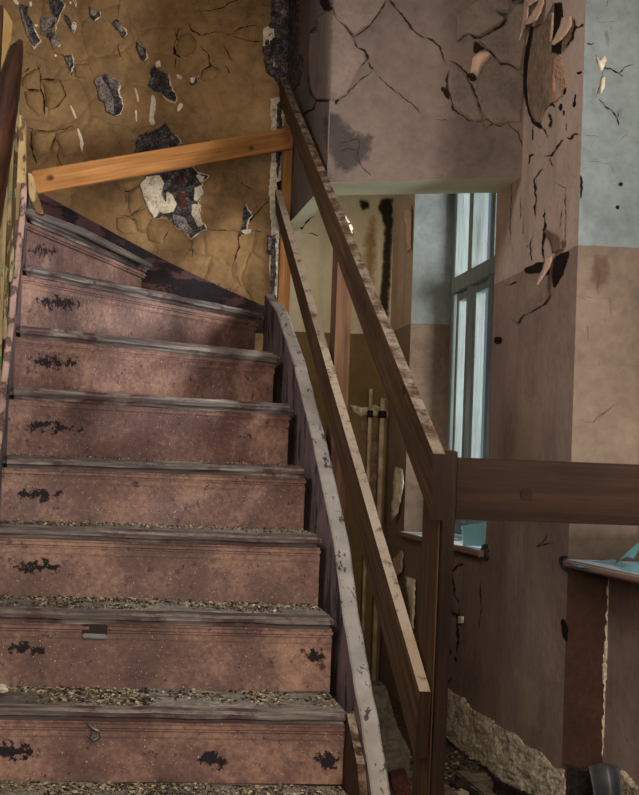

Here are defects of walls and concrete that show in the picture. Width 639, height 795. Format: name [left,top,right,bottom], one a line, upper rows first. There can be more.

flaking render [19,0,77,50]
crack [25,52,72,166]
flaking render [94,74,124,117]
flaking render [136,41,178,103]
flaking render [134,123,183,154]
crack [173,0,260,76]
crack [302,0,598,261]
flaking render [441,0,576,128]
flaking render [140,167,209,239]
crack [209,200,270,268]
crack [513,293,552,323]
flaking render [446,689,594,795]